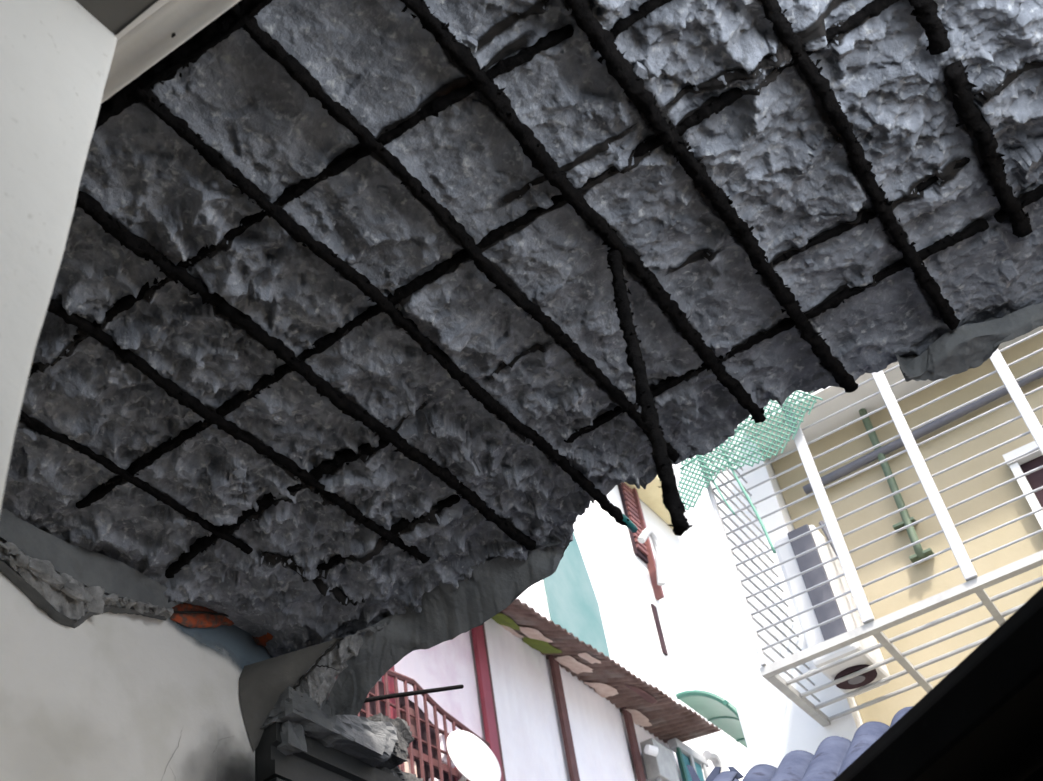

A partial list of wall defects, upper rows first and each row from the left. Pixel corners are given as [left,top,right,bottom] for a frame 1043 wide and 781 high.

spalling [0,0,693,752]
spalling [254,0,1043,465]